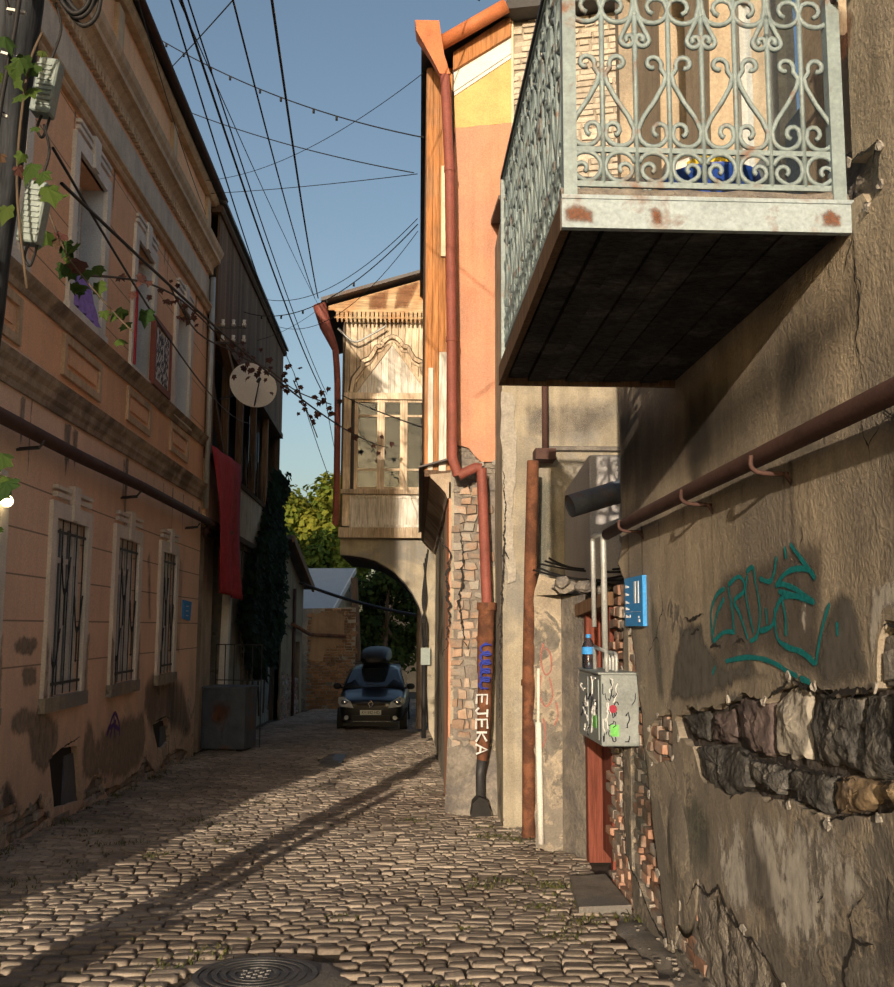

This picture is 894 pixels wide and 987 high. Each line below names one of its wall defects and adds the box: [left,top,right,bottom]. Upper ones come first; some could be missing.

corrosion [566,206,592,222]
corrosion [823,211,840,226]
spalling [845,140,884,212]
crack [845,231,863,382]
water stain [621,384,766,480]
water stain [83,642,189,777]
water stain [634,753,647,844]
spalling [619,613,894,987]
water stain [719,815,860,948]